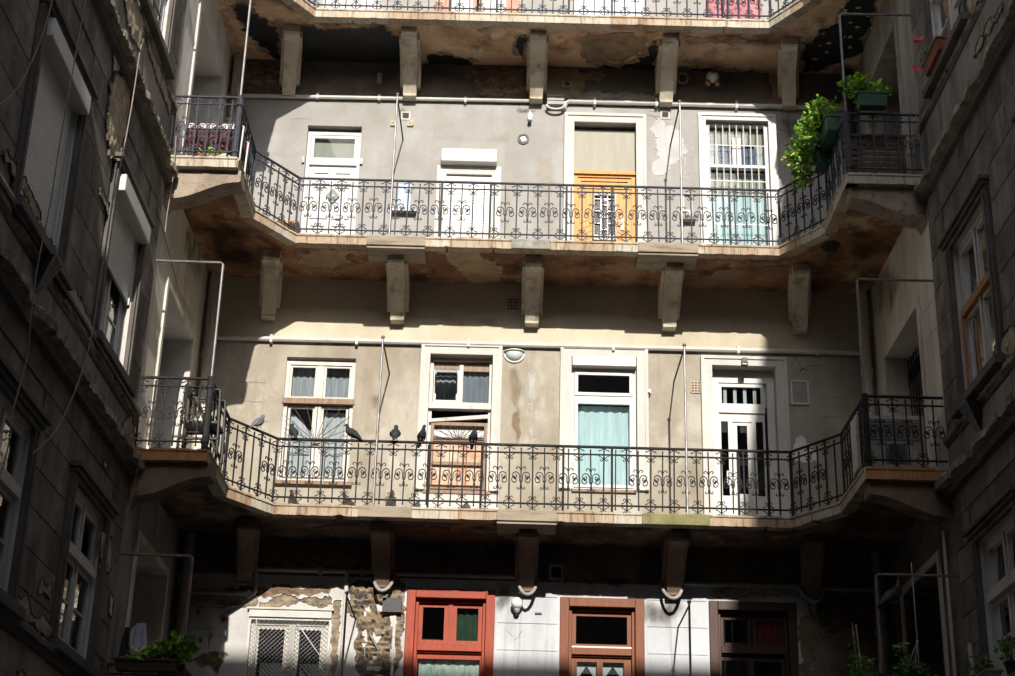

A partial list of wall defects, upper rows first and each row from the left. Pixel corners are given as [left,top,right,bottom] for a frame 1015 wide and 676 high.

peeling [230,0,284,94]
peeling [545,31,660,101]
peeling [800,0,879,74]
flaking render [105,52,132,161]
peeling [650,119,688,176]
flaking render [992,323,1015,360]
flaking render [171,547,406,676]